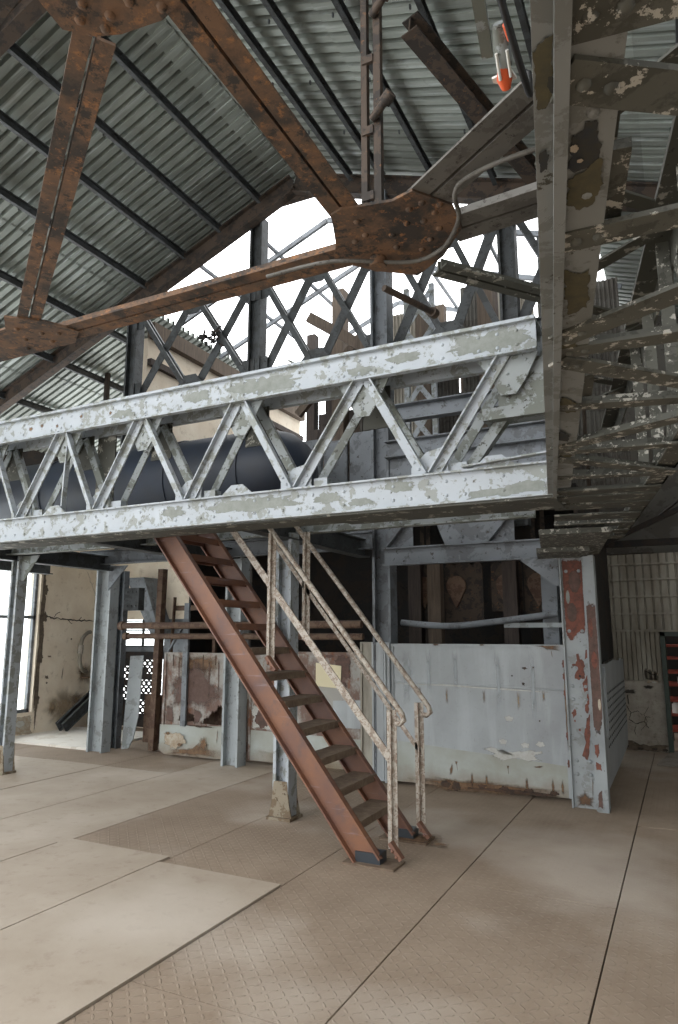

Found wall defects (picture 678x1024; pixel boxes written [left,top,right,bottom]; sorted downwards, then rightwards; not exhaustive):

peeling [532,34,554,110]
peeling [539,150,549,173]
peeling [566,120,604,211]
peeling [564,269,591,315]
peeling [447,327,532,356]
peeling [385,350,420,365]
peeling [161,506,185,519]
peeling [205,492,373,513]
peeling [466,479,547,500]
peeling [562,559,602,771]
peeling [486,739,545,761]
rust [425,761,564,797]